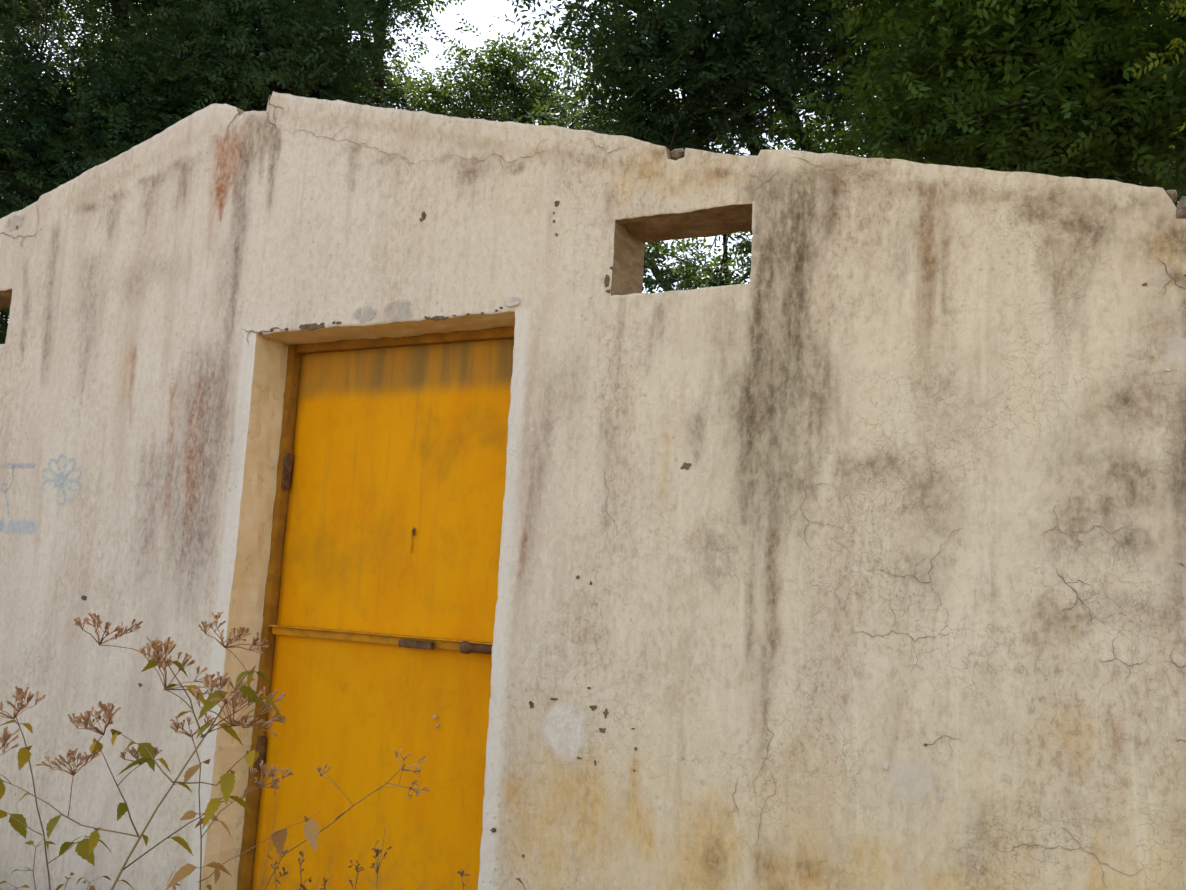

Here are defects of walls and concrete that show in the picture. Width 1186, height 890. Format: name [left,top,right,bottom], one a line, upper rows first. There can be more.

corrosion [216,139,239,208]
crack [853,528,962,675]
crack [1041,503,1186,683]
crack [989,828,1151,889]